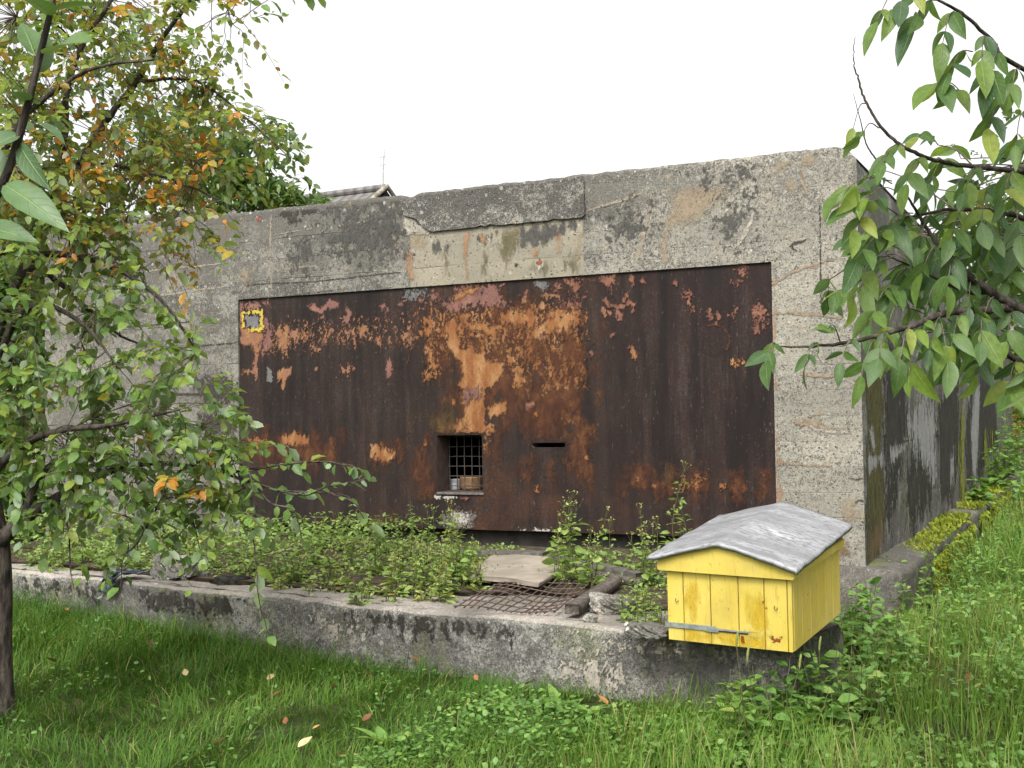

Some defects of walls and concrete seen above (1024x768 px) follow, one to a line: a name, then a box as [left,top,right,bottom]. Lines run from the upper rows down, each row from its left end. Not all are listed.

water stain [284,199,420,285]
spalling [392,216,430,251]
rust [242,292,602,498]
rust [622,439,782,503]
water stain [863,323,998,565]
water stain [343,609,525,650]